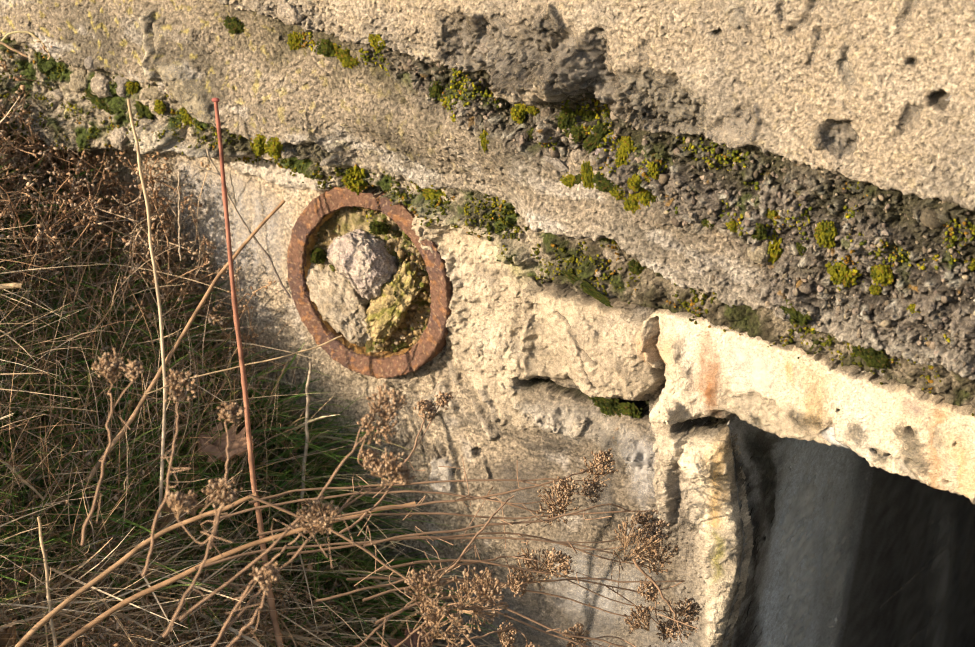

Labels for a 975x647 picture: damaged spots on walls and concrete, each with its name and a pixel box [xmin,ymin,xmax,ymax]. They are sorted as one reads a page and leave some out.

rust [704,364,717,412]